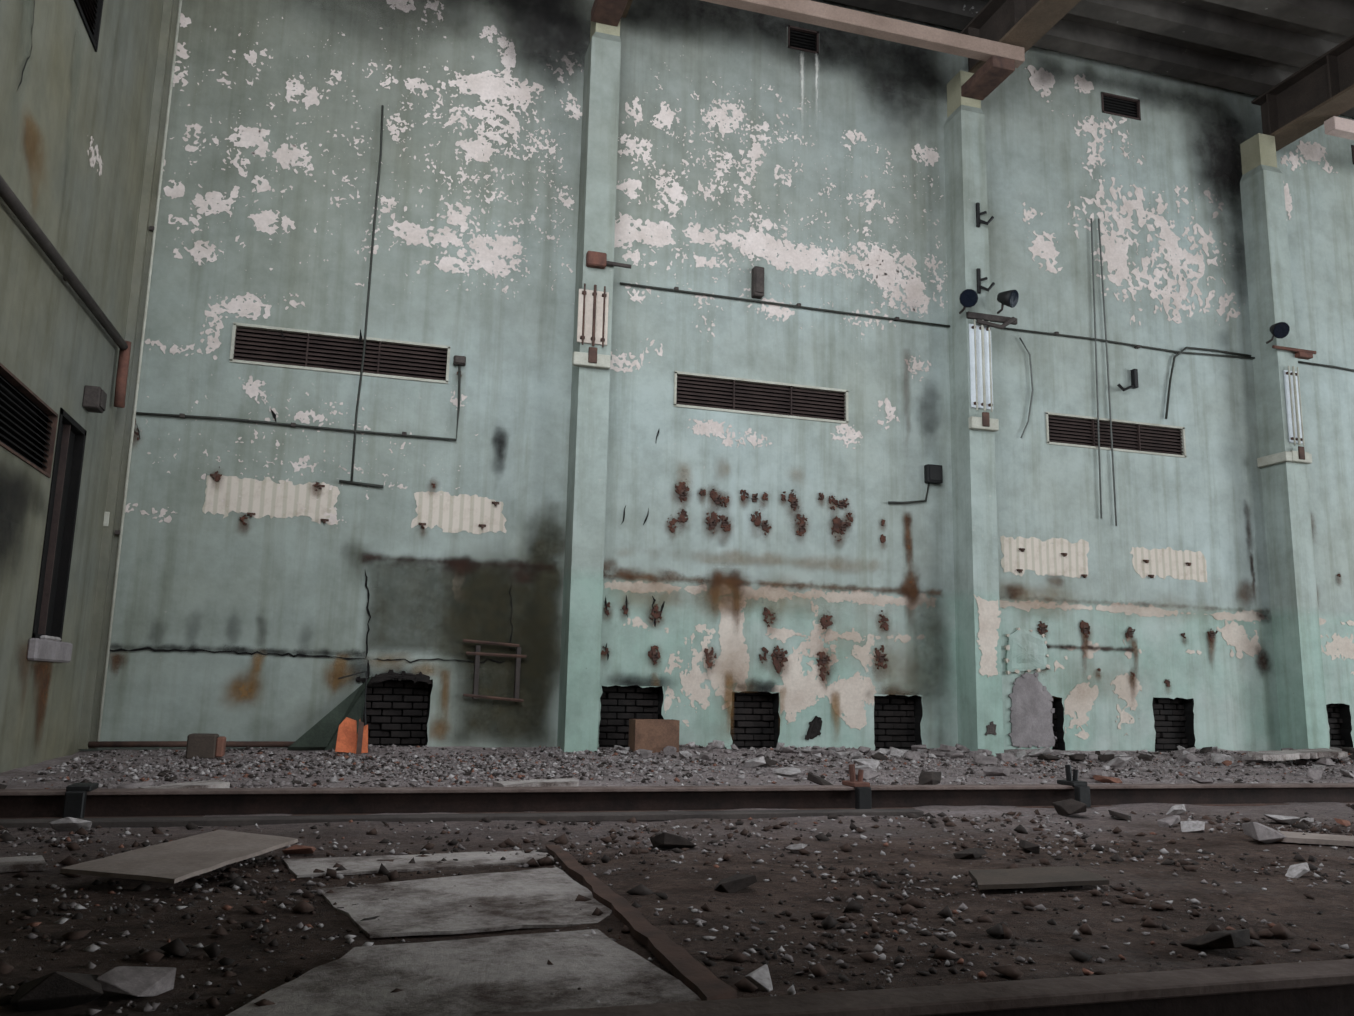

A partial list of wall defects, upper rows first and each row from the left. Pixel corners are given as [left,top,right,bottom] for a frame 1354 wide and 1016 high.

peeling [160,13,582,299]
peeling [614,62,948,341]
peeling [1019,65,1245,326]
rust [603,564,807,613]
rust [667,482,808,536]
rust [818,493,853,542]
rust [823,514,940,602]
peeling [604,580,936,740]
rust [759,645,788,674]
rust [874,610,889,669]
spalling [985,637,1144,748]
peeling [973,594,1269,677]